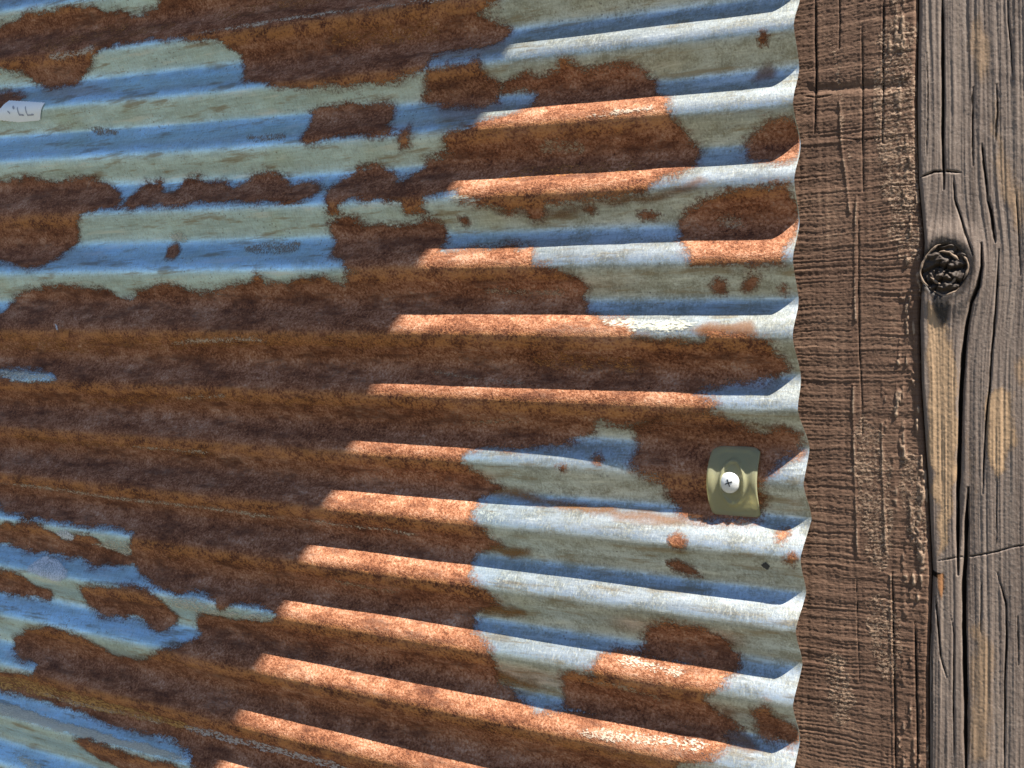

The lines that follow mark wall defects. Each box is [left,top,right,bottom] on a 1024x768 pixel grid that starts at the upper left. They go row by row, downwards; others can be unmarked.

rust [0,0,806,768]
crack [892,0,1023,768]